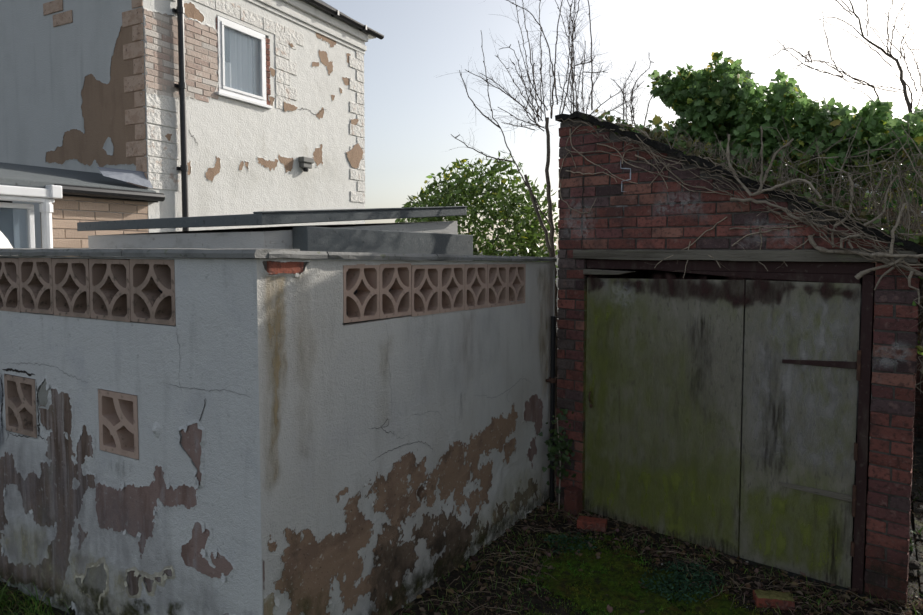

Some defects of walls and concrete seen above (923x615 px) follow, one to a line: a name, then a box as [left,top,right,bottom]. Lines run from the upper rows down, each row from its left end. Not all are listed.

spalling [44,1,220,169]
peeling [311,32,351,120]
peeling [268,95,298,113]
peeling [204,155,222,183]
peeling [238,153,294,175]
peeling [312,143,324,168]
peeling [345,142,363,170]
spalling [258,258,311,279]
leakage [268,285,282,427]
peeling [0,375,238,615]
peeling [263,391,544,615]